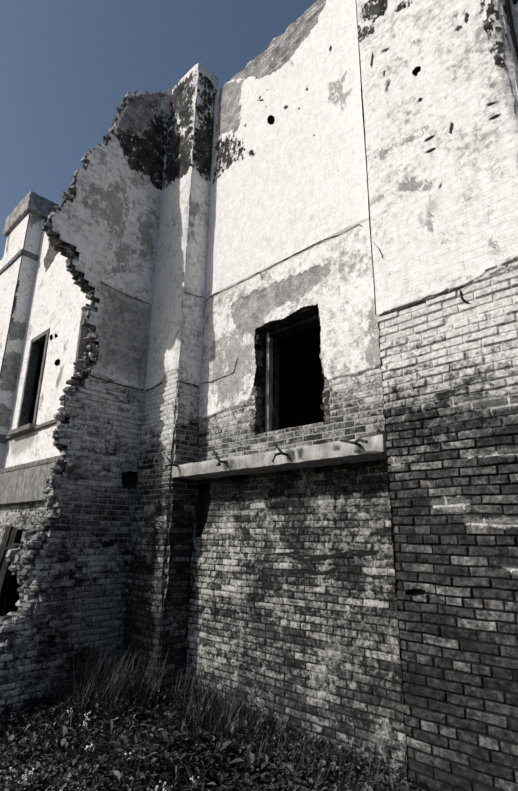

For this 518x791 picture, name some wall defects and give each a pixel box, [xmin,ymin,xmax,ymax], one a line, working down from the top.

peeling [356,0,412,42]
peeling [480,0,518,69]
spalling [0,0,331,697]